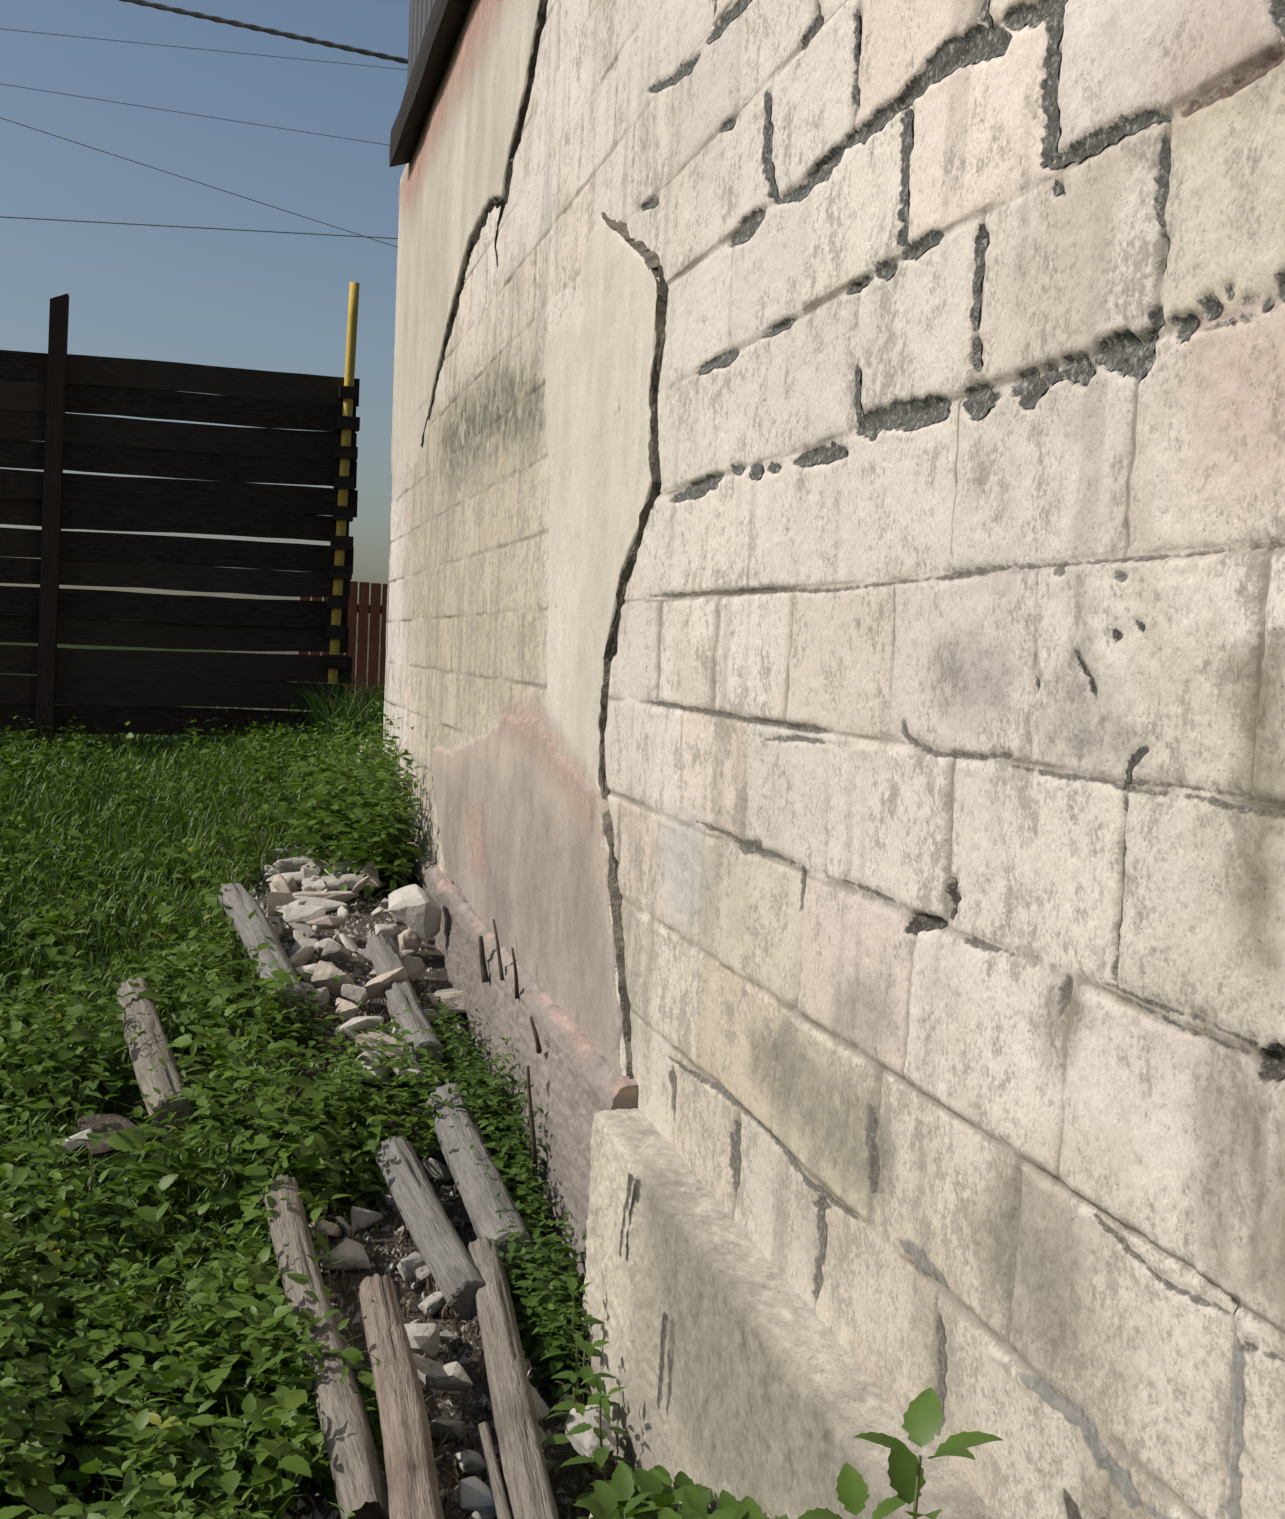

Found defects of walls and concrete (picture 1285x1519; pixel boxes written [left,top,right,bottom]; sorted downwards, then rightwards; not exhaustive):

spalling [647,0,751,92]
spalling [1268,0,1285,37]
spalling [719,117,737,132]
spalling [730,0,1171,295]
crack [421,0,548,448]
spalling [641,198,659,210]
spalling [670,222,1285,503]
crack [598,249,1285,1303]
spalling [1258,1043,1285,1084]
crack [1093,1213,1283,1361]
crack [657,1312,668,1409]